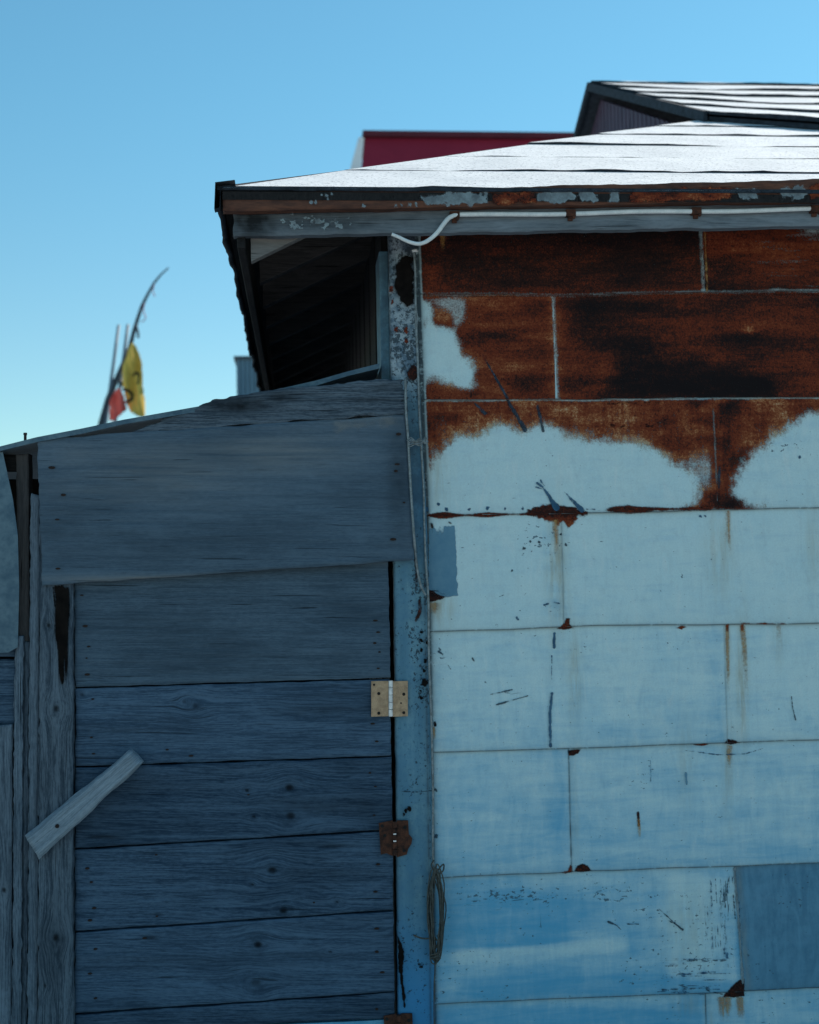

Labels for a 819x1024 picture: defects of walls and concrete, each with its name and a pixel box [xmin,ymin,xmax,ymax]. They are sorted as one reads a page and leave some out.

peeling [395,192,488,207]
peeling [537,192,619,203]
peeling [737,188,758,200]
peeling [781,185,807,200]
peeling [394,255,414,307]
corrosion [407,229,819,544]
corrosion [726,623,767,675]
corrosion [719,980,745,1016]